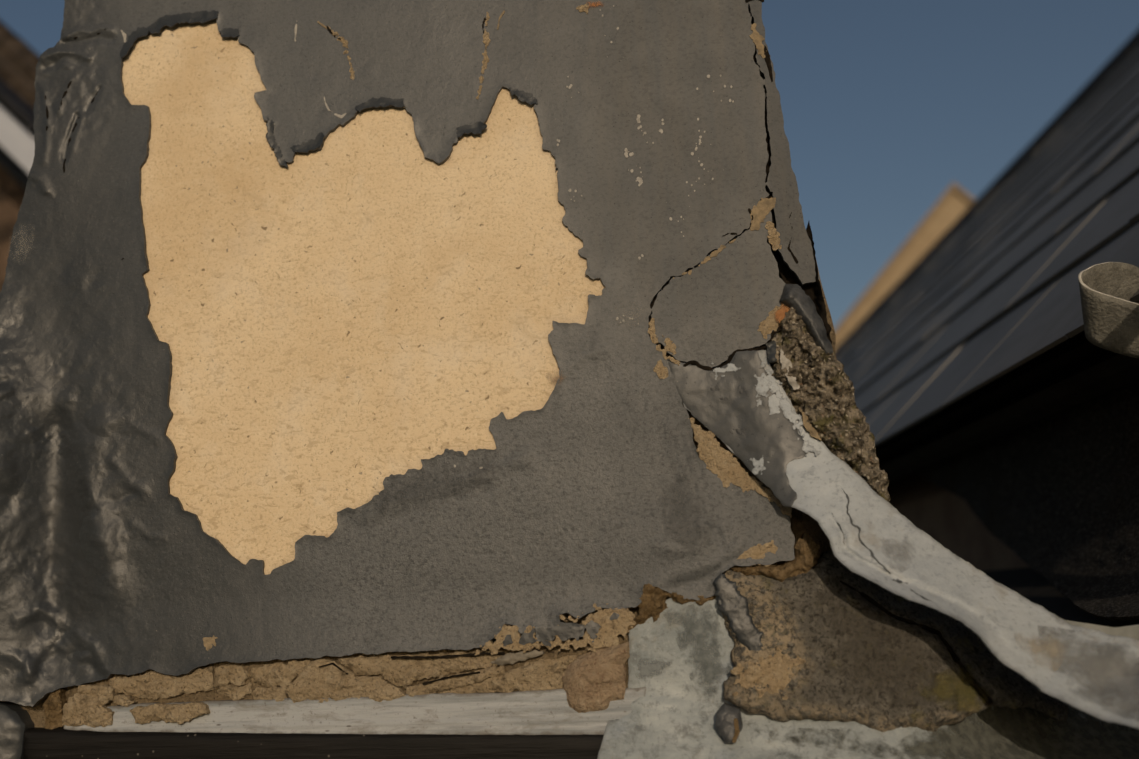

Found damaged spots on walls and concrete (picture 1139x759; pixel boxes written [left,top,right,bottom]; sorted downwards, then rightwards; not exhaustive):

crack [647,0,798,371]
peeling [120,10,605,575]
peeling [711,362,741,380]
peeling [754,303,821,456]
spalling [688,417,792,518]
spalling [737,540,778,567]
spalling [203,635,217,651]
peeling [475,603,636,657]
spalling [730,647,806,700]